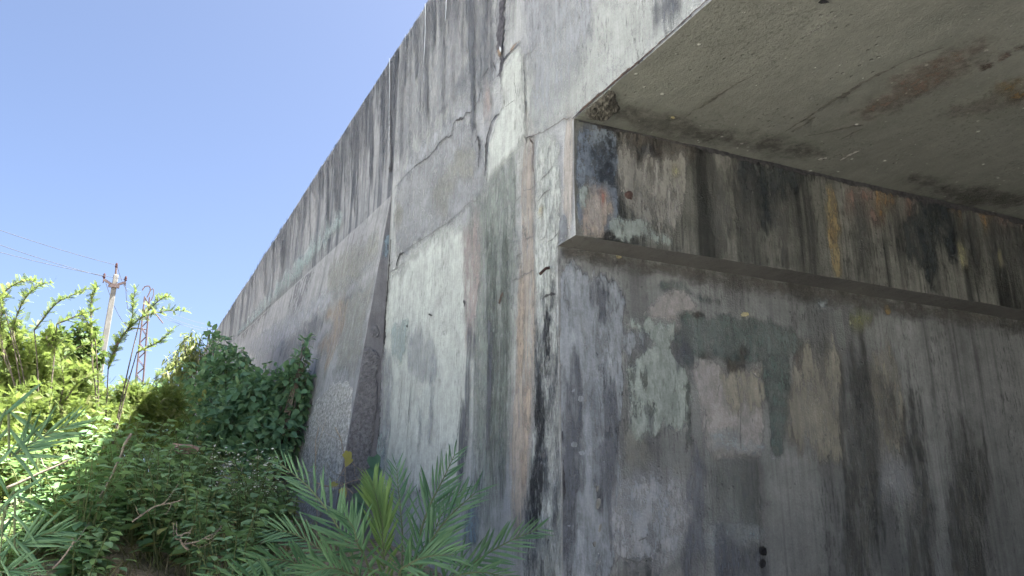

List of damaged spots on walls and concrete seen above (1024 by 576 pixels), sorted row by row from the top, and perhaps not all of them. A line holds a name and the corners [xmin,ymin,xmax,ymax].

damp [223,0,591,321]
crack [383,0,707,358]
damp [523,248,1024,576]